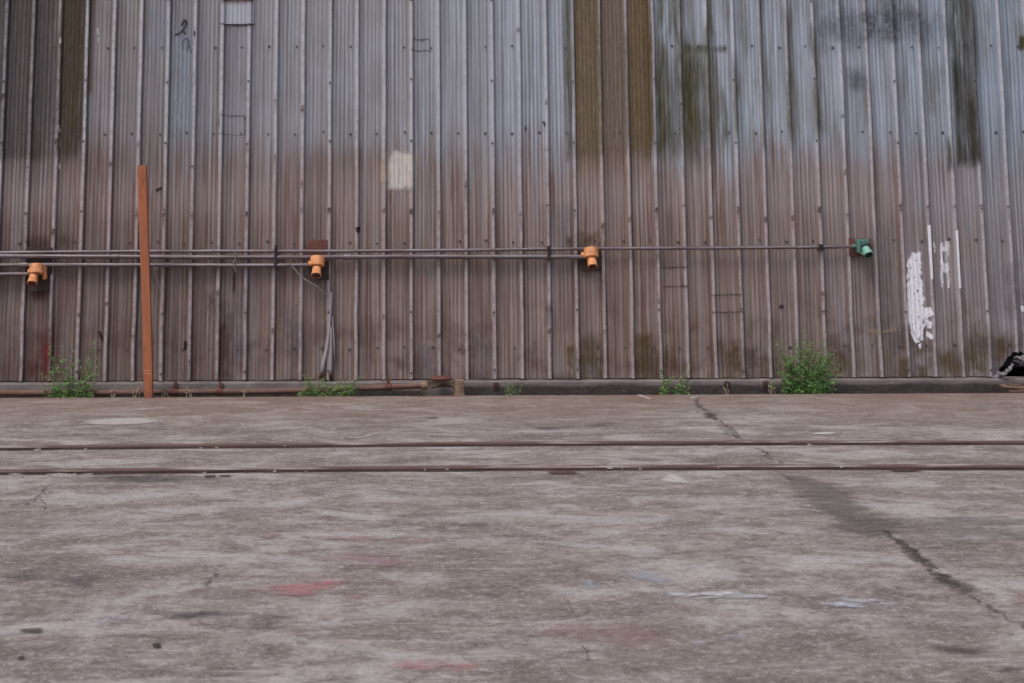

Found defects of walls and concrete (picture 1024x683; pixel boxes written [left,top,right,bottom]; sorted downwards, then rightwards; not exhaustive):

damp [57,0,99,169]
damp [565,0,663,153]
peeling [910,307,934,349]
crack [694,398,794,480]
crack [883,530,1024,628]